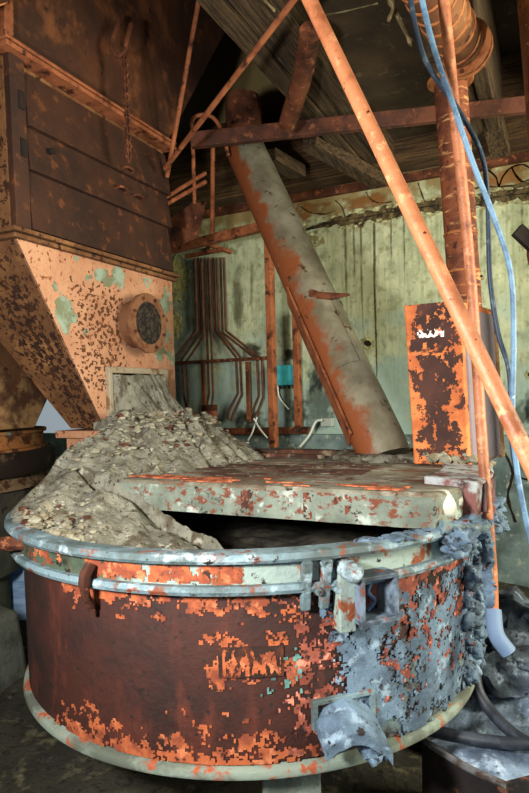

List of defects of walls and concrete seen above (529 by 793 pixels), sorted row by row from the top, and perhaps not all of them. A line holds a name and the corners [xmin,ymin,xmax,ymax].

corrosion [482,166,522,188]
corrosion [295,202,329,221]
corrosion [351,193,384,209]
water stain [236,412,260,428]
water stain [292,370,333,430]
water stain [515,399,529,423]